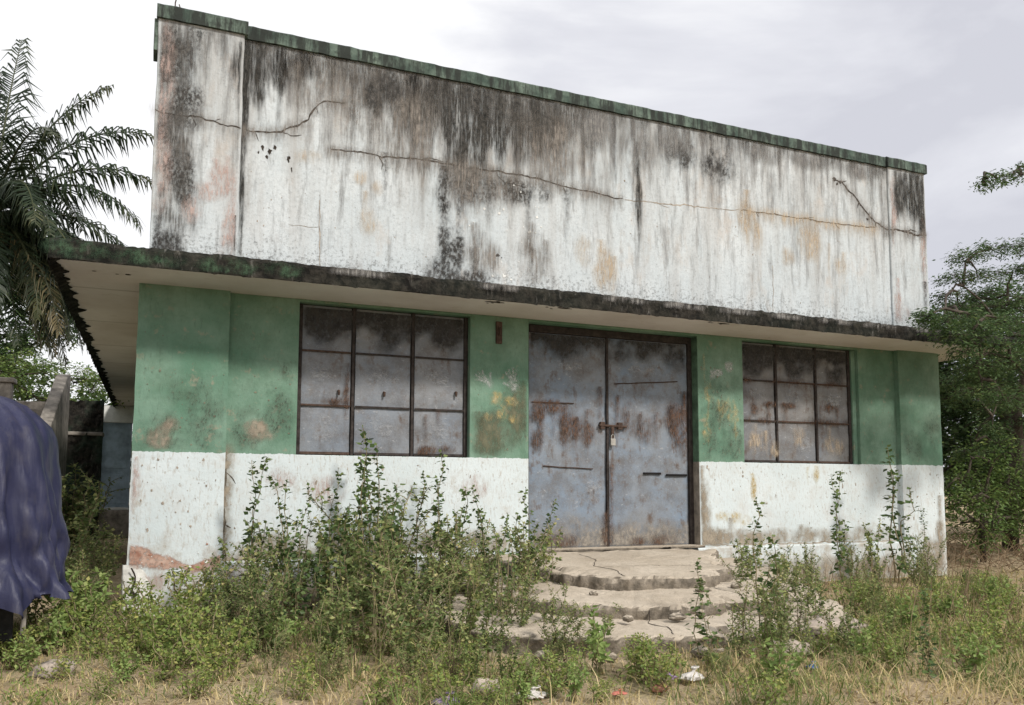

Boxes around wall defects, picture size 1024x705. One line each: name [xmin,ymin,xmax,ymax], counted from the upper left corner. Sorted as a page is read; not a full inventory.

damp [158,28,211,204]
crack [155,100,345,141]
damp [233,42,569,212]
damp [234,171,244,249]
crack [328,147,927,237]
damp [581,108,727,224]
damp [848,164,925,233]
damp [428,224,518,291]
damp [525,224,548,276]
corrosion [532,399,595,449]
corrosion [616,391,687,449]
spalling [129,546,220,588]